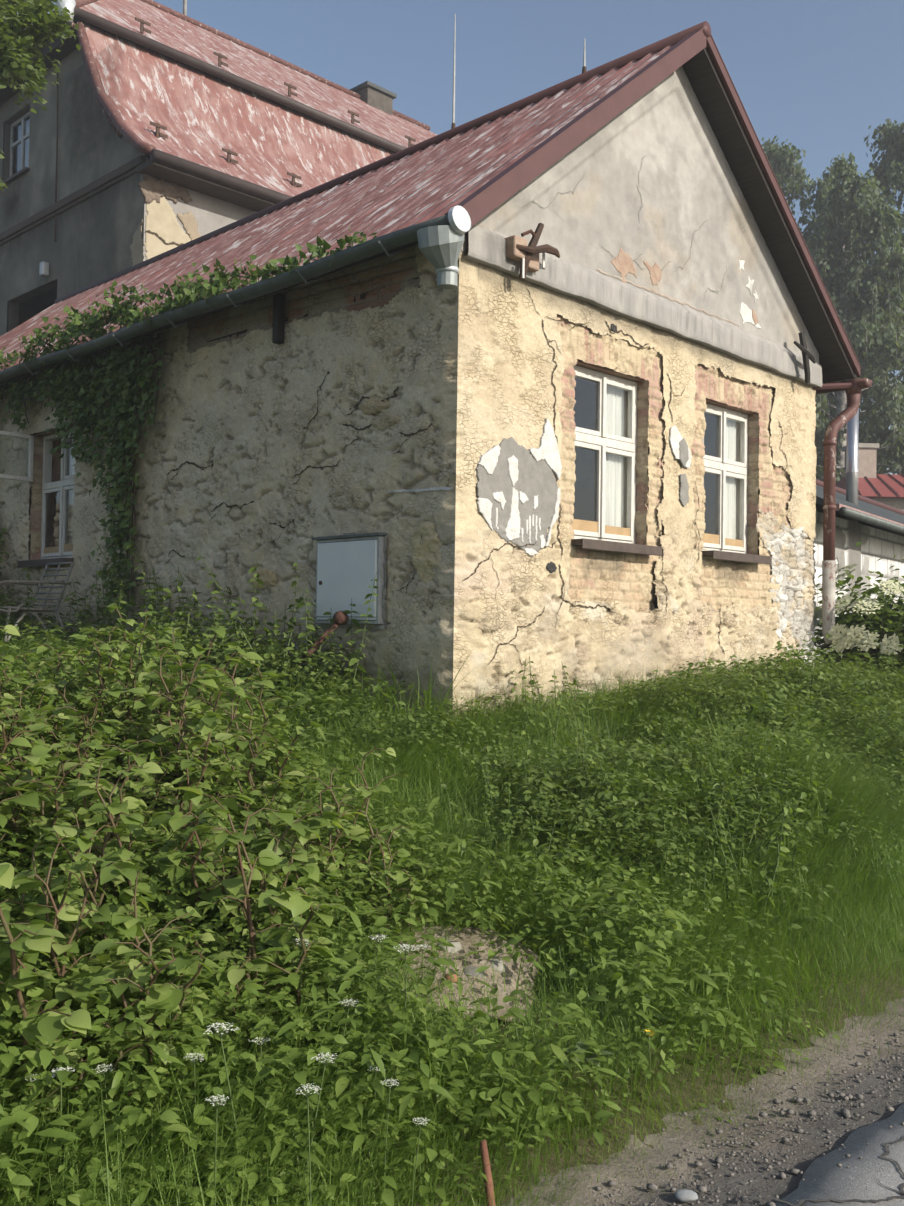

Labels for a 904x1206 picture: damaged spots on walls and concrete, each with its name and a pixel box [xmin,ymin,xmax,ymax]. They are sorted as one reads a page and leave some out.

flaking render [130,173,201,266]
crack [292,372,432,484]
crack [526,287,649,443]
spalling [476,314,816,669]
spalling [597,248,761,329]
crack [462,477,615,669]